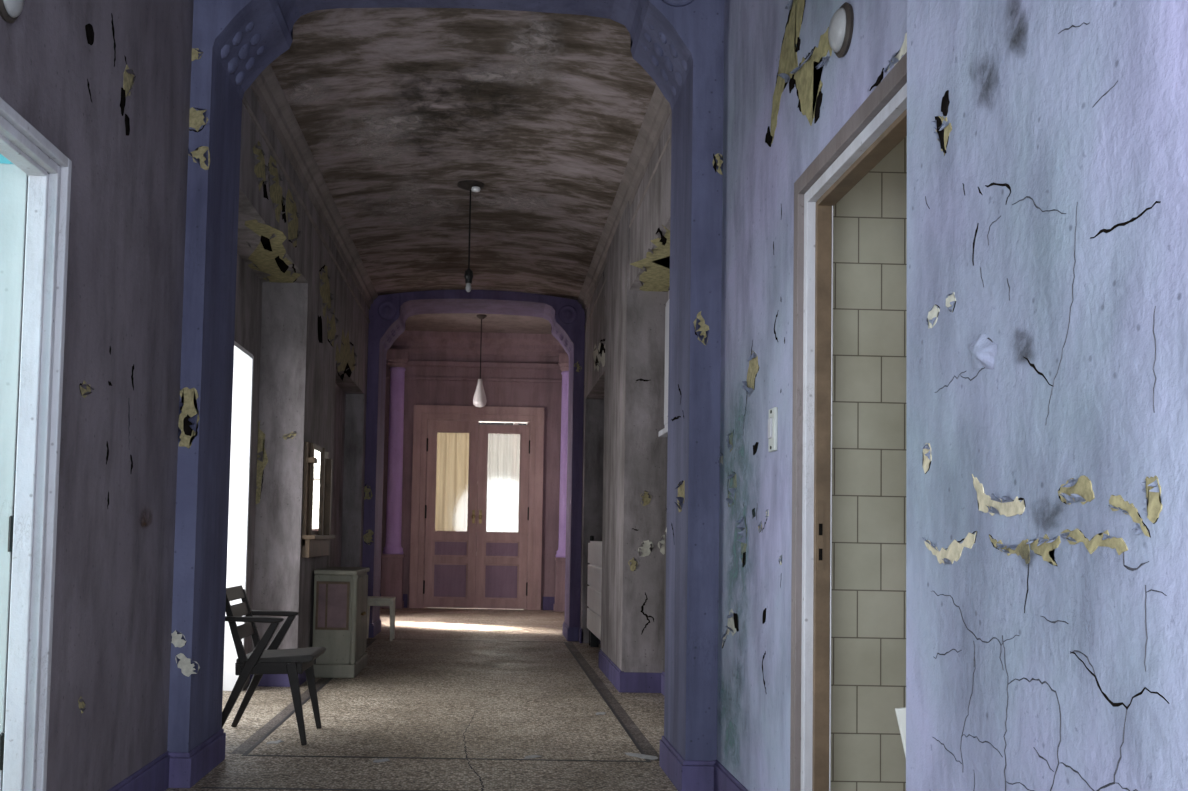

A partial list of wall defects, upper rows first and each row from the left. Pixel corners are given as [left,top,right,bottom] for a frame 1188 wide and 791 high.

peeling [765,0,832,147]
flaking render [869,32,907,91]
flaking render [931,90,952,156]
peeling [630,225,670,292]
crack [962,182,1161,422]
peeling [628,480,685,571]
peeling [922,474,1163,613]
crack [641,592,654,635]
crack [931,585,1169,791]
crack [463,710,484,791]